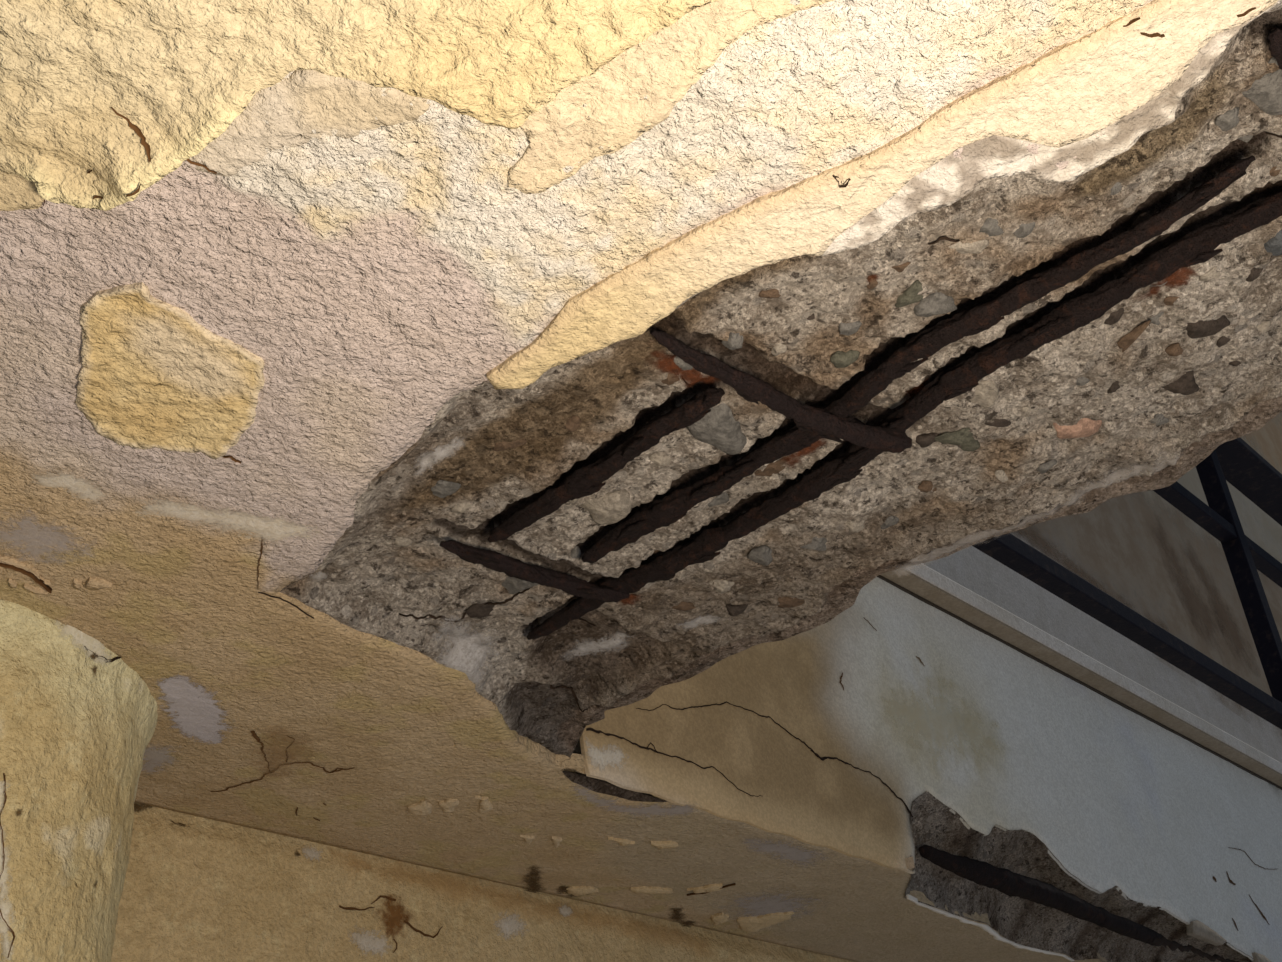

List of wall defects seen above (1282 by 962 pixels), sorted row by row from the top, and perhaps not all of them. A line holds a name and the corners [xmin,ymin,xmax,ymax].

peeling [0,0,834,211]
rust [1268,28,1282,70]
peeling [75,282,265,459]
spalling [279,0,1282,802]
rust [439,155,1282,640]
flaking render [158,675,230,744]
crack [210,730,355,821]
crack [586,728,761,797]
crack [636,701,913,817]
rust [918,845,1162,946]
spalling [904,791,1271,962]